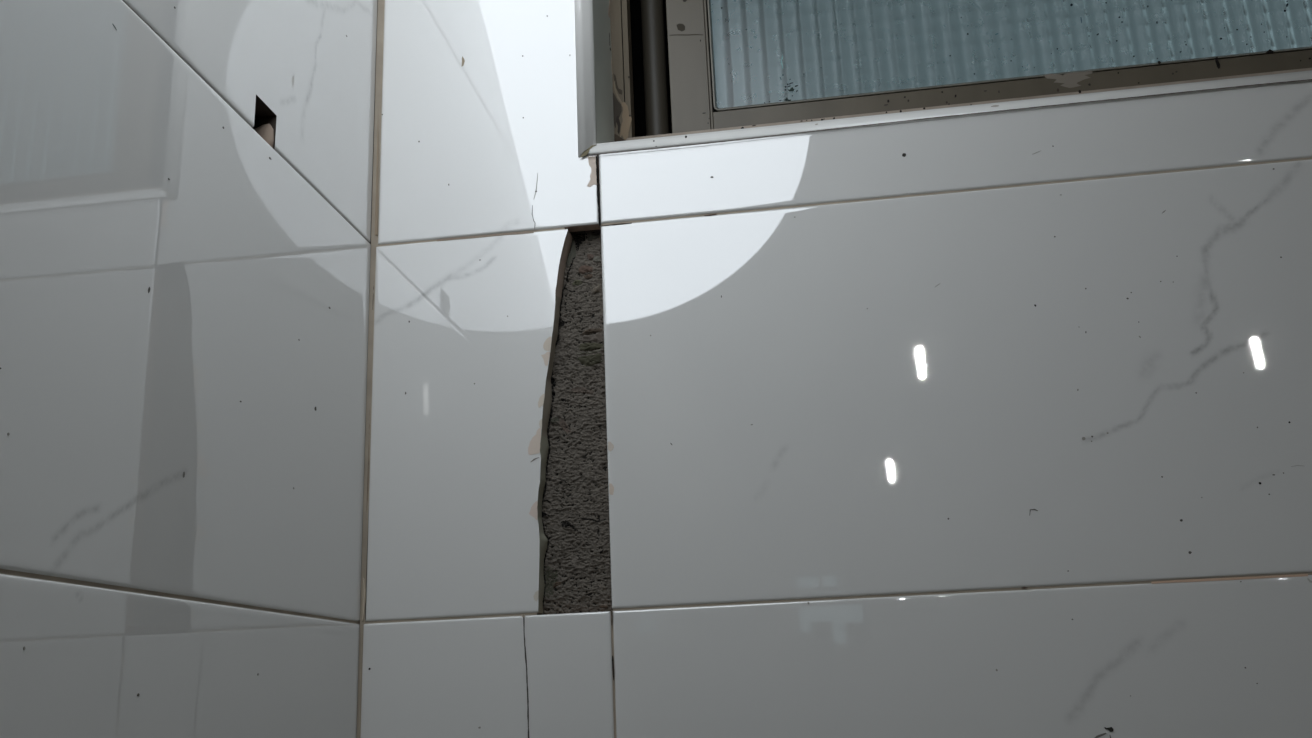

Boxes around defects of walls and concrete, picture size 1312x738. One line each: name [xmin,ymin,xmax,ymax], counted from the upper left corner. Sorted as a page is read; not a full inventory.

crack [523,257,606,738]
spalling [521,229,614,617]